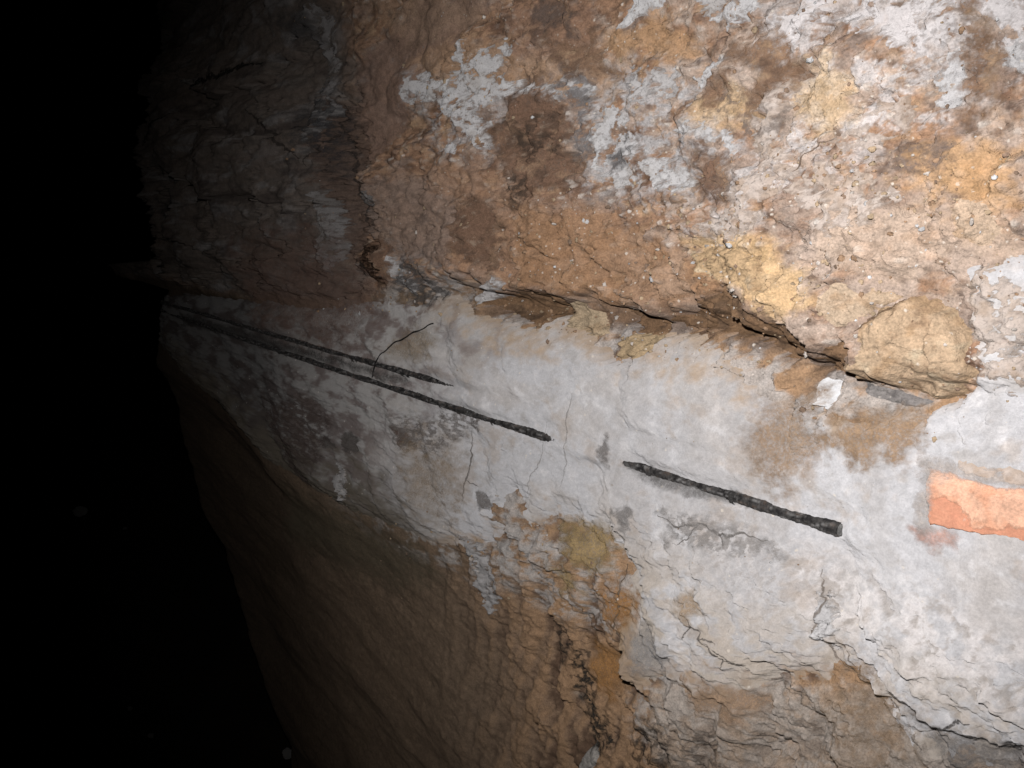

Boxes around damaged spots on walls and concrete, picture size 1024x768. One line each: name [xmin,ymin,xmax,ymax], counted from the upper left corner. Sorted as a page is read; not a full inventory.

spalling [485,0,635,195]
spalling [703,24,814,113]
spalling [960,19,1007,123]
spalling [475,290,575,329]
spalling [627,288,849,372]
crack [855,299,906,331]
damp [459,536,502,615]
crack [612,564,628,642]
crack [681,613,724,671]
crack [810,569,859,672]
damp [556,623,616,753]
crack [892,696,1022,748]